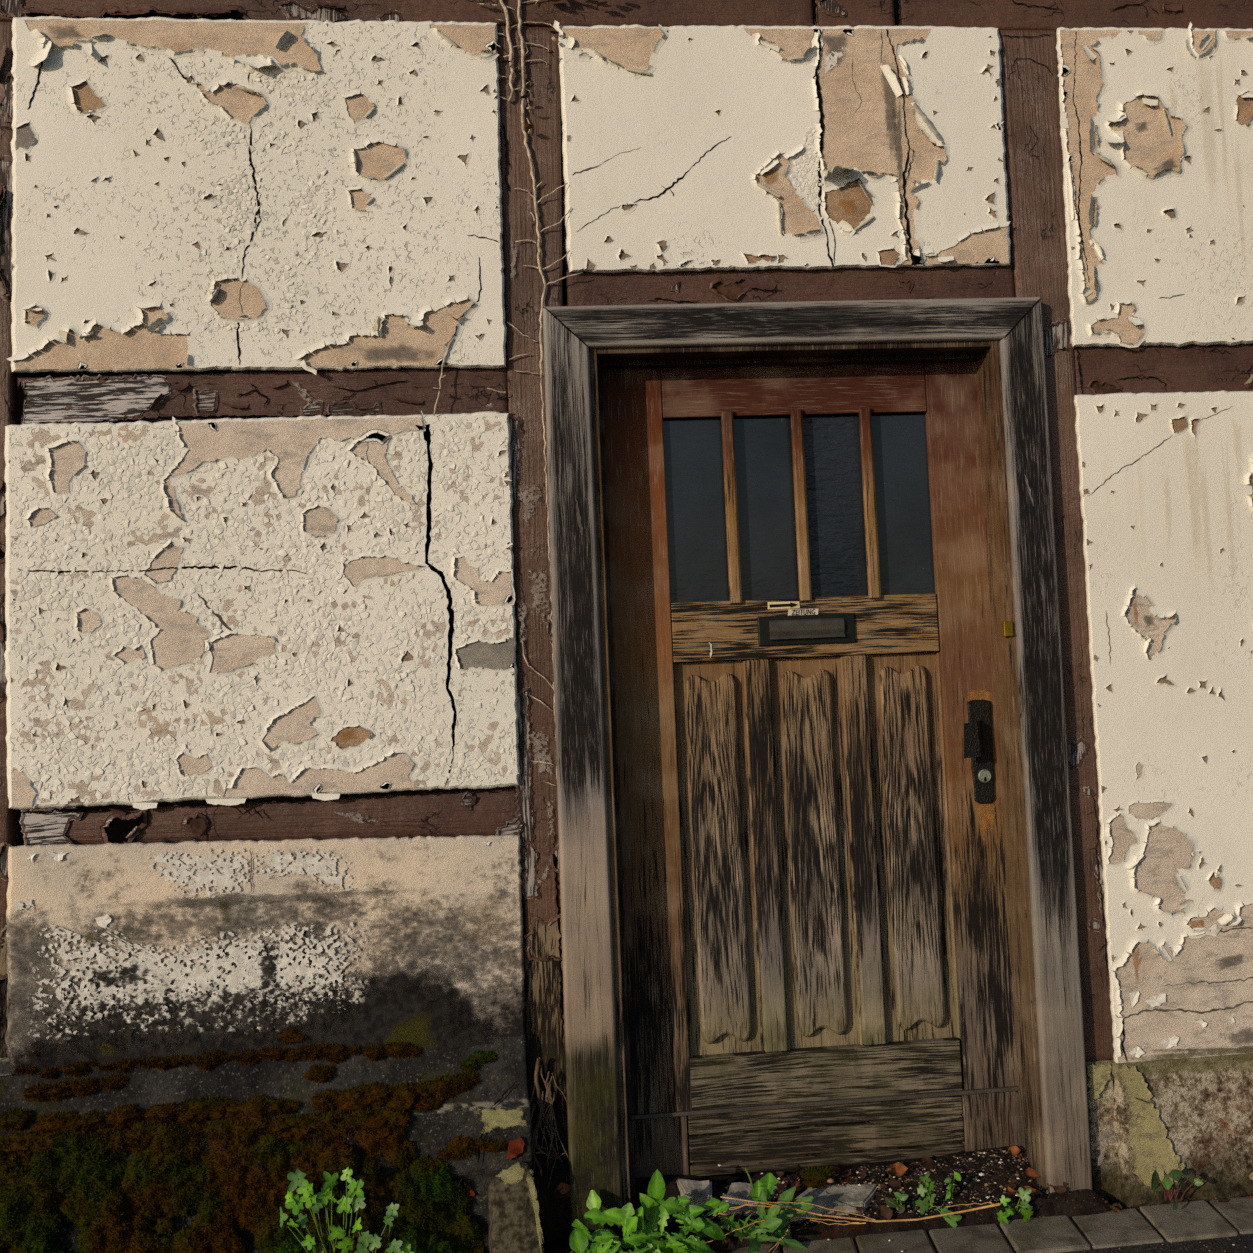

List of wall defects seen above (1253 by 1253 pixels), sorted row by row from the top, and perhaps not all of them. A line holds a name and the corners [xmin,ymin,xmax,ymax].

crack [16,127,408,424]
crack [576,136,731,232]
peeling [708,0,1011,303]
crack [813,0,915,267]
crack [1001,0,1090,282]
peeling [1043,30,1194,358]
peeling [0,0,560,900]
crack [19,424,516,840]
peeling [1120,584,1178,662]
water stain [14,888,500,1073]
water stain [260,853,306,870]
peeling [1084,798,1253,1062]